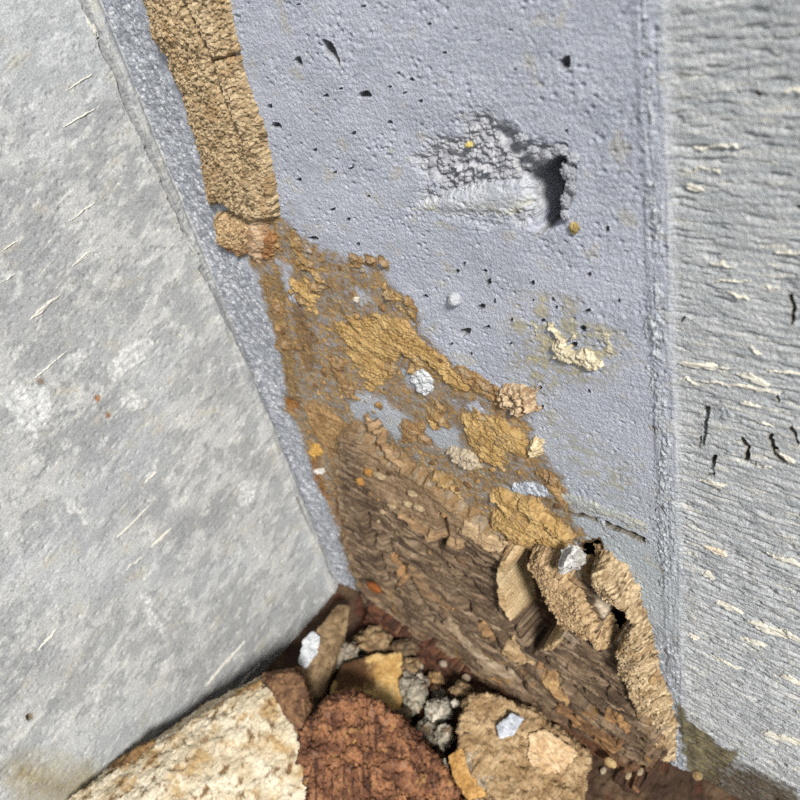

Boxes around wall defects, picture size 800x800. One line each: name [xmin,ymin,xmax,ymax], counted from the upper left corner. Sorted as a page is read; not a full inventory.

peeling [347,252,389,271]
peeling [382,287,418,322]
spalling [406,356,451,430]
peeling [399,418,433,446]
spalling [512,468,560,497]
crack [489,474,649,546]
spalling [558,537,605,575]